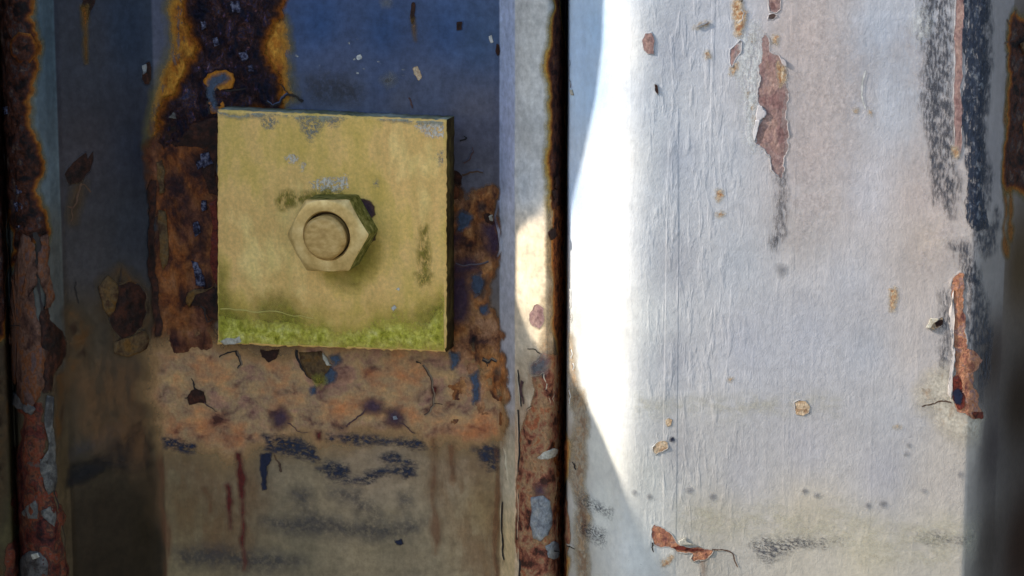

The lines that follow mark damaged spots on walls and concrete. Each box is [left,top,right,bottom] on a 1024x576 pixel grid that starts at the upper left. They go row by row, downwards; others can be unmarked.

corrosion [0,0,52,343]
corrosion [0,306,69,576]
corrosion [142,0,511,571]
corrosion [514,0,591,576]
peeling [650,523,738,567]
peeling [753,0,791,180]
peeling [926,270,984,420]
corrosion [1002,10,1024,257]